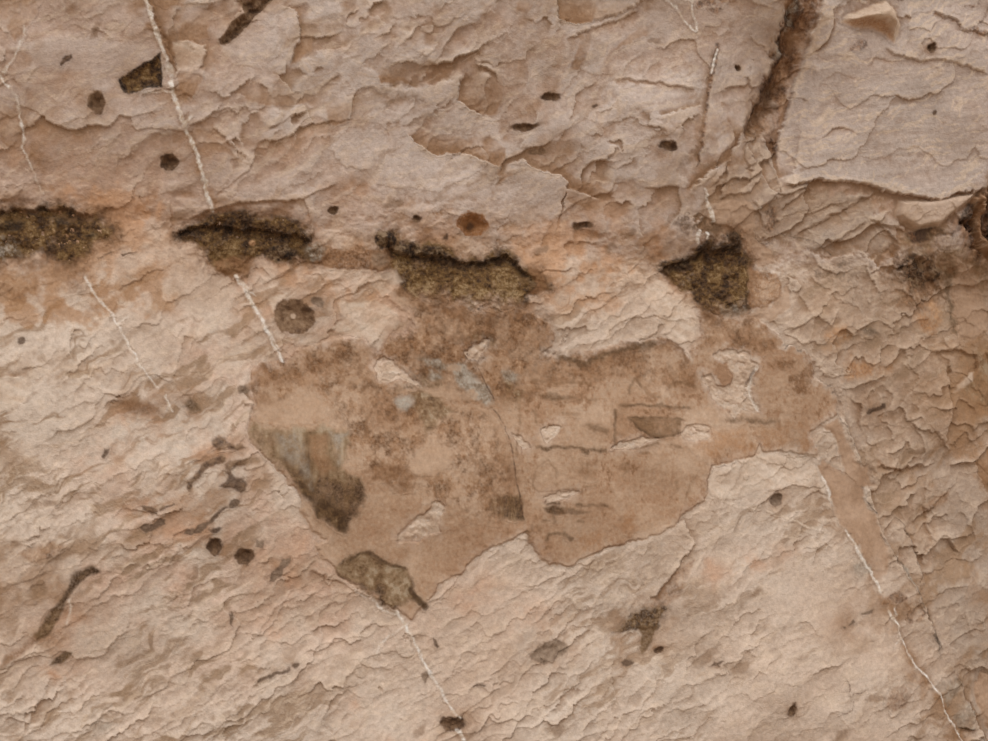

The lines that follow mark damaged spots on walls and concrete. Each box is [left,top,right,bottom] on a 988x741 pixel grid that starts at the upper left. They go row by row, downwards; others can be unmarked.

crack [142,0,216,214]
leakage [0,187,135,314]
crack [83,250,174,413]
crack [233,273,285,364]
leakage [159,195,902,537]
leakage [330,548,430,612]
crack [821,412,988,741]
crack [353,588,467,741]